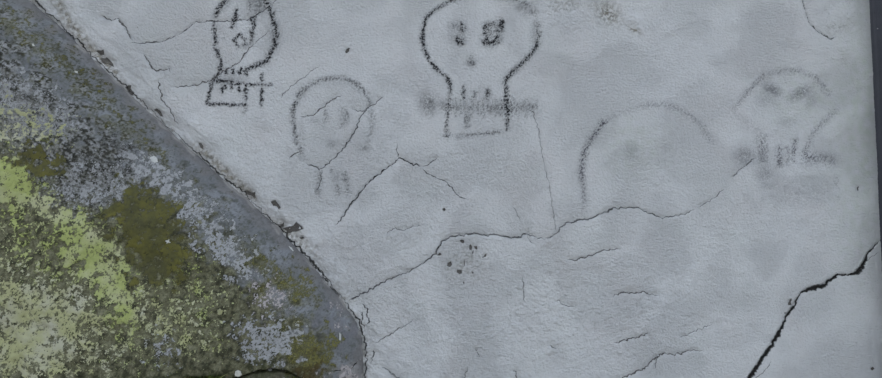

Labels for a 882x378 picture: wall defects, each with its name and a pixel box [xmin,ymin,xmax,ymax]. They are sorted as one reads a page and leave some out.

crack [748,241,879,378]